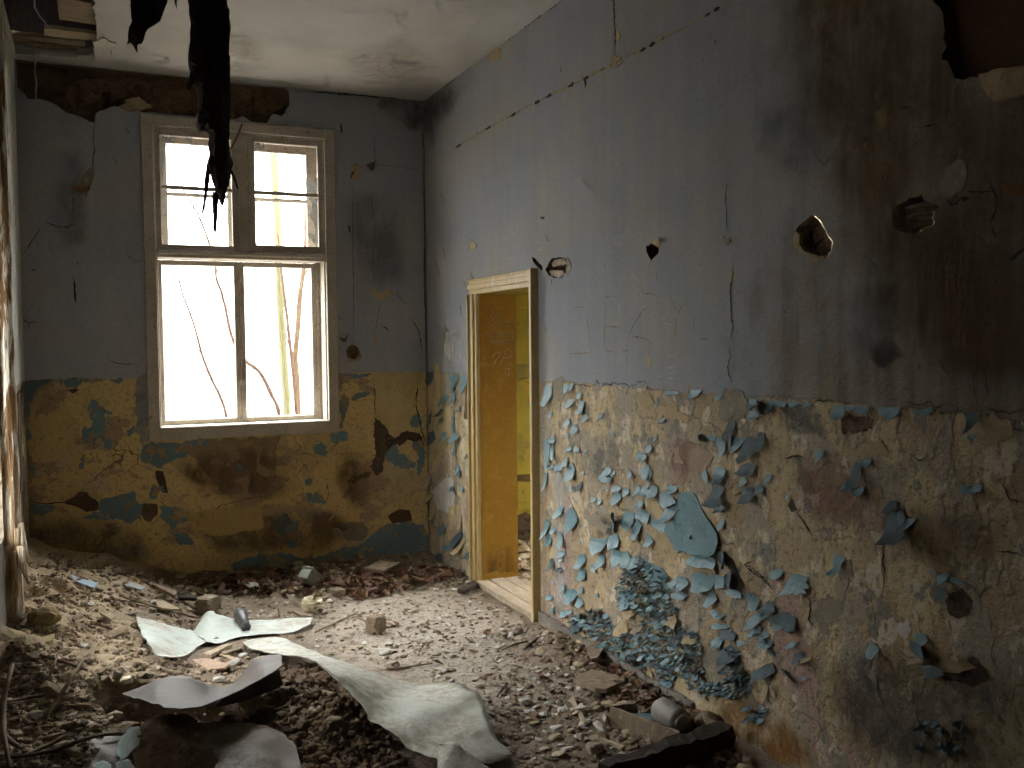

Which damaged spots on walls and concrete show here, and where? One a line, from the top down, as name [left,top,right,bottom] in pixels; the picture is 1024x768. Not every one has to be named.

spalling [16,37,198,123]
spalling [230,83,289,123]
spalling [933,0,1024,80]
spalling [532,257,567,278]
spalling [646,238,660,269]
spalling [793,215,833,262]
crack [726,282,734,383]
peeling [79,369,209,469]
peeling [231,364,469,569]
peeling [80,484,194,545]
peeling [538,376,812,725]
peeling [894,619,977,679]